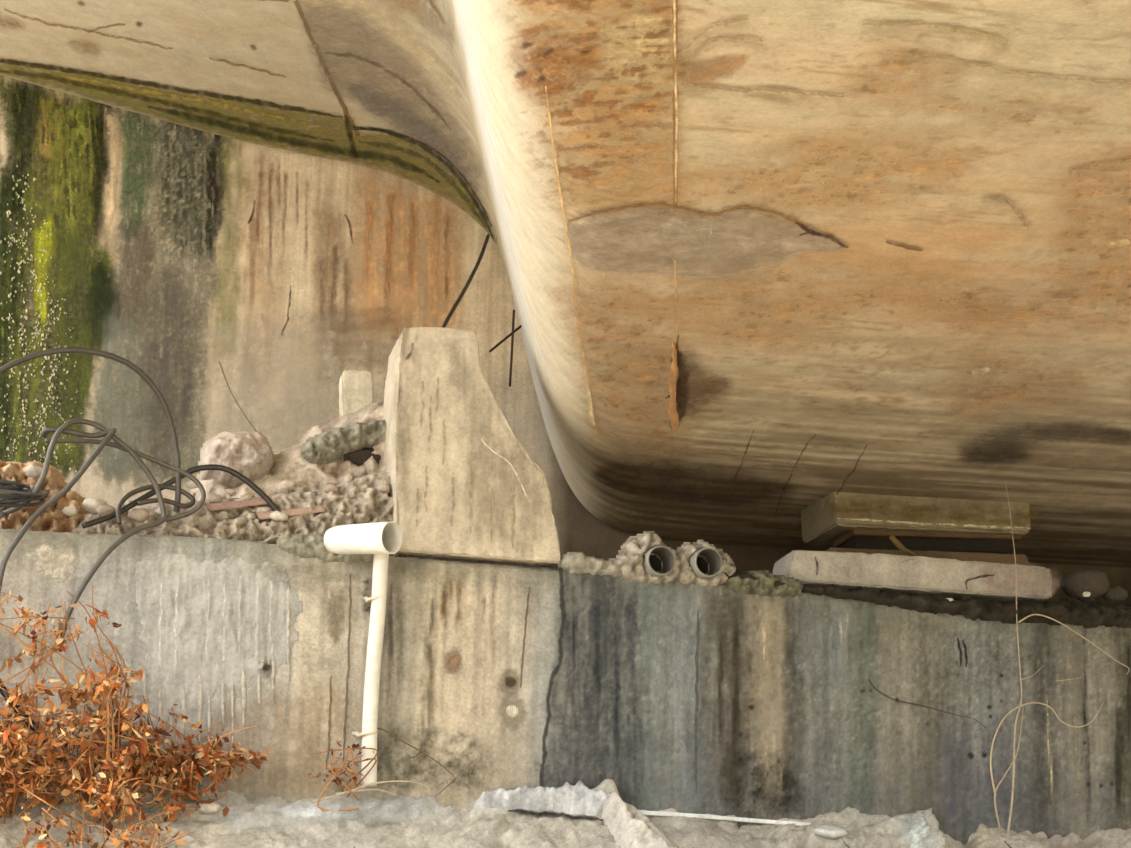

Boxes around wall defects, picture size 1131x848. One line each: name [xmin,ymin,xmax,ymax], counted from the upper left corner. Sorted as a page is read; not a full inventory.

leakage [0,0,494,478]
leakage [543,574,637,794]
leakage [683,611,699,794]
leakage [713,603,789,793]
leakage [1037,689,1053,800]
leakage [1115,628,1131,808]